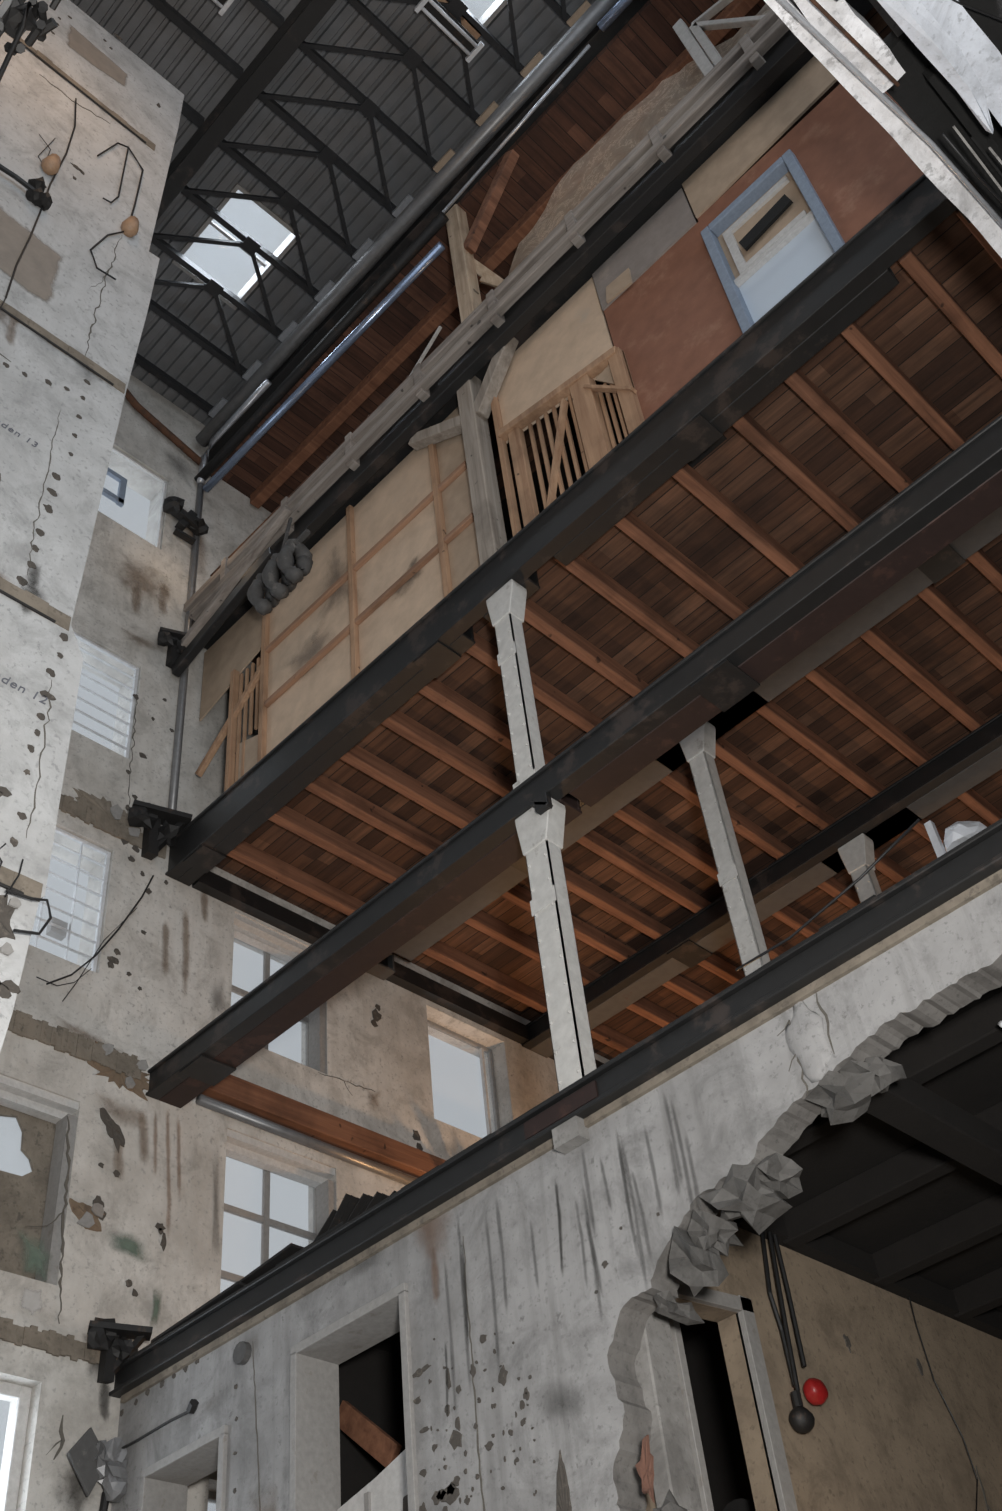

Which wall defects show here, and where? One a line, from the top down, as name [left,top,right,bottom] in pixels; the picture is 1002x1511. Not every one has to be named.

crack [27,410,61,575]
spalling [0,895,22,956]
spalling [805,1056,907,1125]
spalling [98,1108,125,1178]
spalling [69,1195,106,1232]
spalling [654,1153,803,1325]
flaking render [635,1435,688,1511]